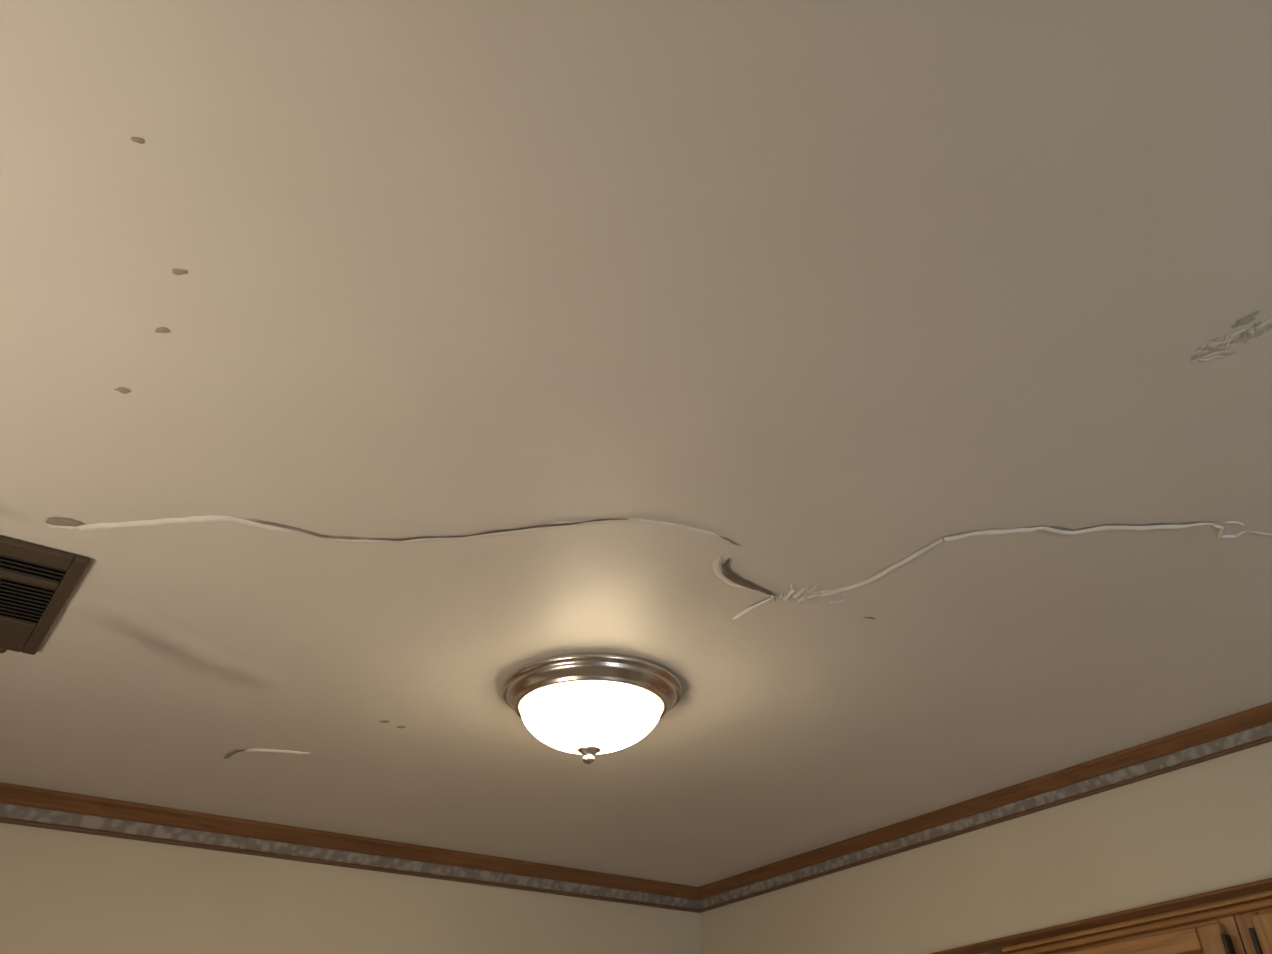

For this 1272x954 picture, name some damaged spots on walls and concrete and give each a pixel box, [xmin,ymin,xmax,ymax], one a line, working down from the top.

peeling [1190,310,1272,363]
crack [67,515,777,620]
crack [820,521,1272,597]
crack [224,748,311,759]